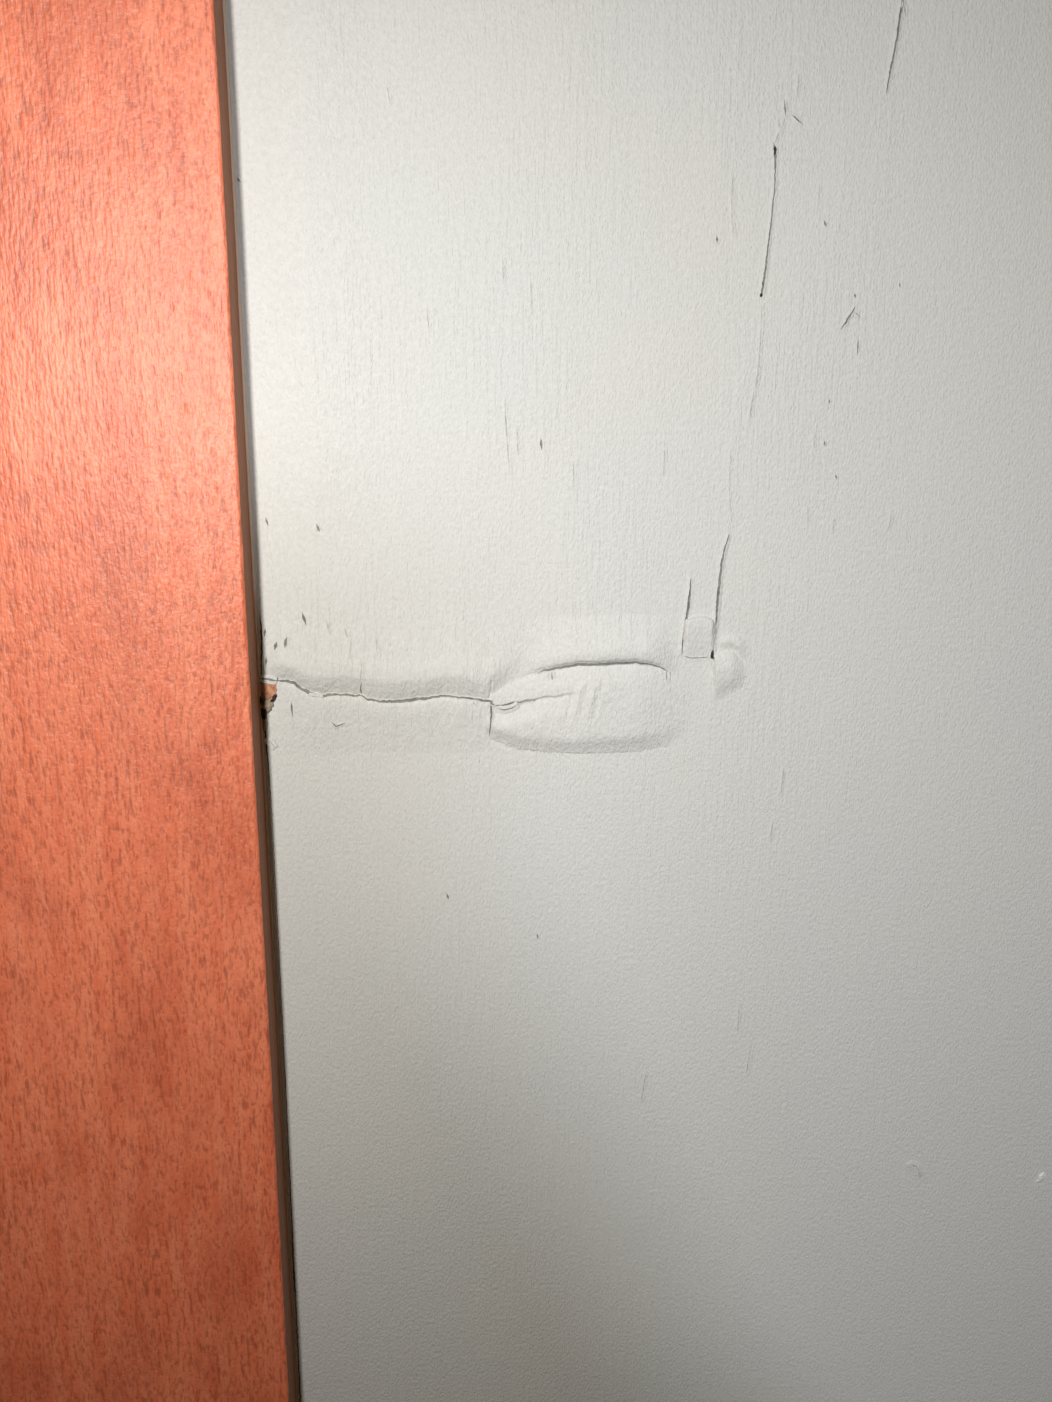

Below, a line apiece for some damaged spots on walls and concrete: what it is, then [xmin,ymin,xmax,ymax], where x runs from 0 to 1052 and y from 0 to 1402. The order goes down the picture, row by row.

crack [258,532,732,1402]